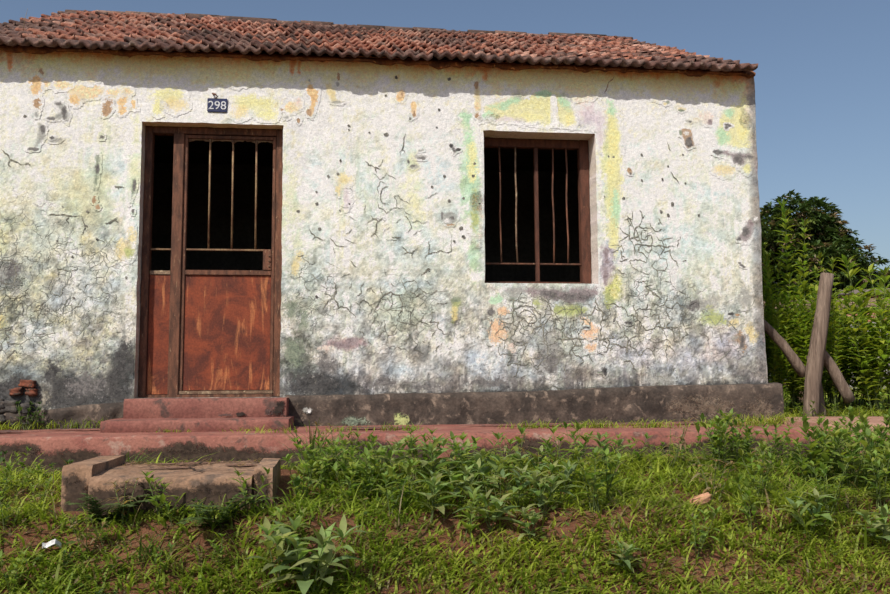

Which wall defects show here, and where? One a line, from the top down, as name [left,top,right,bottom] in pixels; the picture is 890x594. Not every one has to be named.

peeling [23,67,140,153]
peeling [455,80,583,131]
damp [0,249,35,300]
crack [0,214,118,357]
crack [284,133,455,362]
damp [280,243,766,397]
crack [481,211,756,390]
spalling [0,369,46,426]
damp [34,329,135,410]
damp [667,396,734,424]